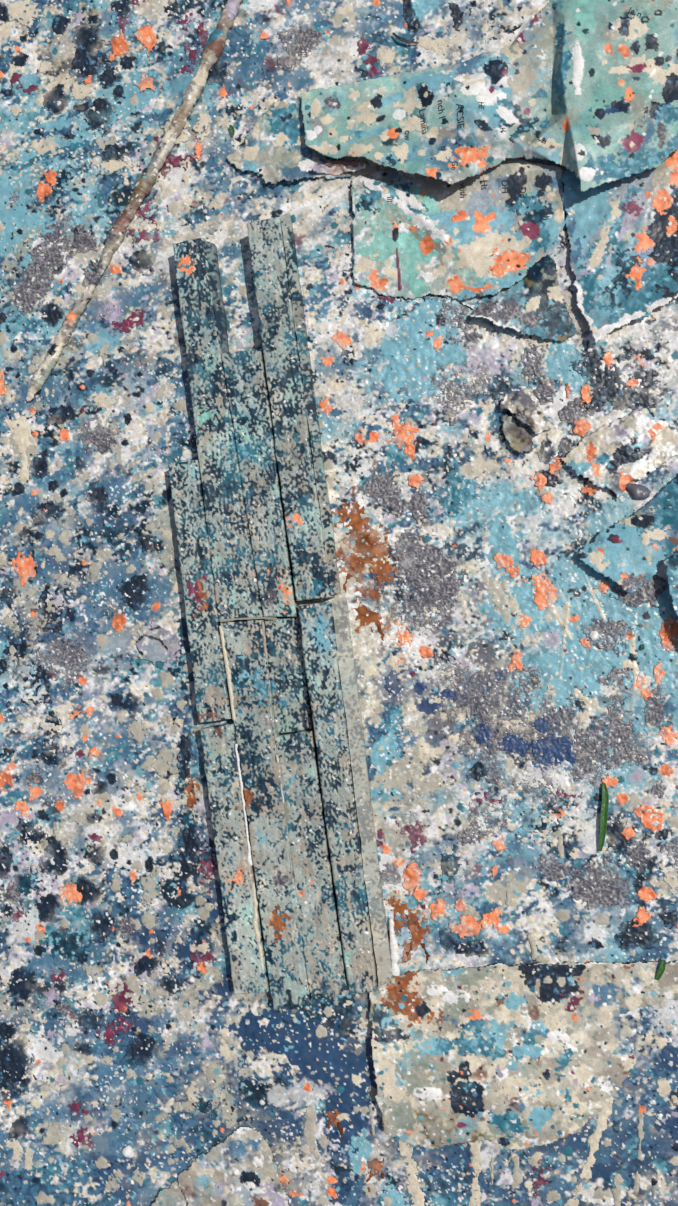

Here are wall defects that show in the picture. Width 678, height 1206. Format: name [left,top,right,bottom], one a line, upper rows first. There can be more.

peeling [226,101,351,185]
peeling [499,390,551,454]
peeling [561,409,678,500]
rust [331,486,406,643]
peeling [151,1180,187,1206]